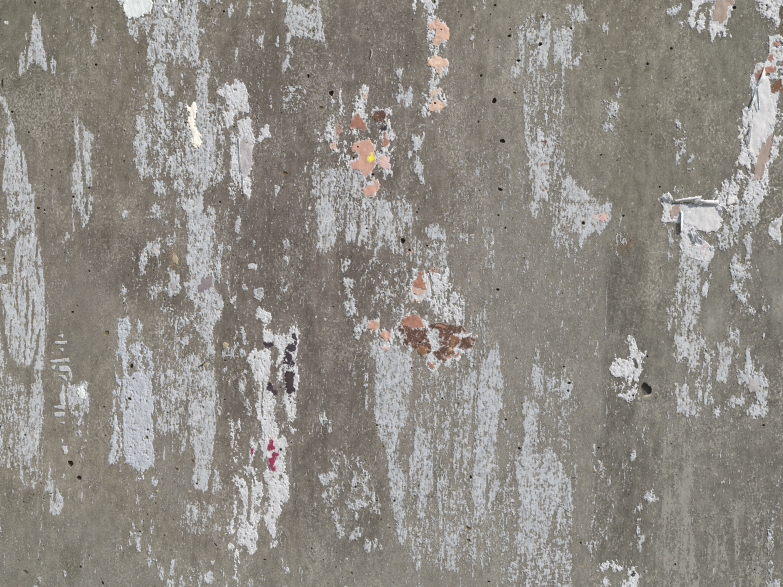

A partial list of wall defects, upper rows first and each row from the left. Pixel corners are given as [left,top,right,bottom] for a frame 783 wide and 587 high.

peeling [0,10,122,587]
peeling [104,0,657,587]
peeling [666,226,681,265]
peeling [673,113,698,173]
peeling [663,0,735,46]
peeling [627,250,772,587]
peeling [713,0,783,321]
peeling [746,420,783,587]